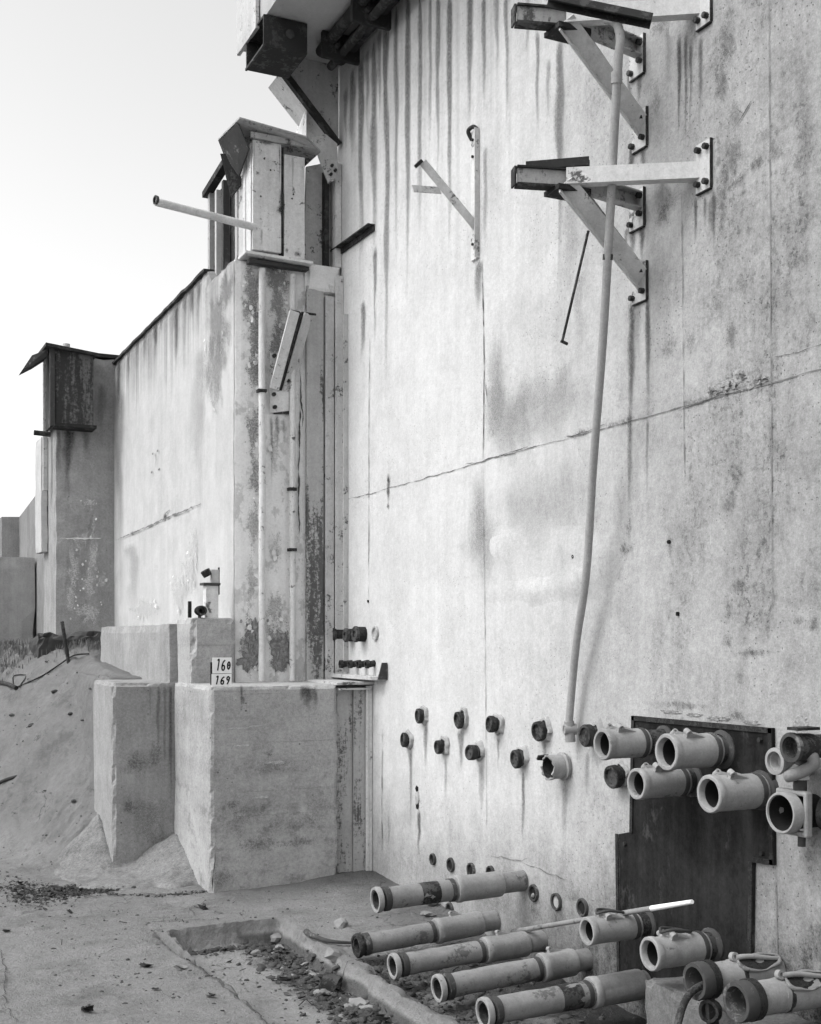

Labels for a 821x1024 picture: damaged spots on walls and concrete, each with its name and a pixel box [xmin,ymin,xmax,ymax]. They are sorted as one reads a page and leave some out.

water stain [467,0,485,79]
water stain [344,0,452,293]
water stain [555,44,563,158]
crack [732,56,770,172]
crack [352,231,821,561]
crack [65,503,201,540]